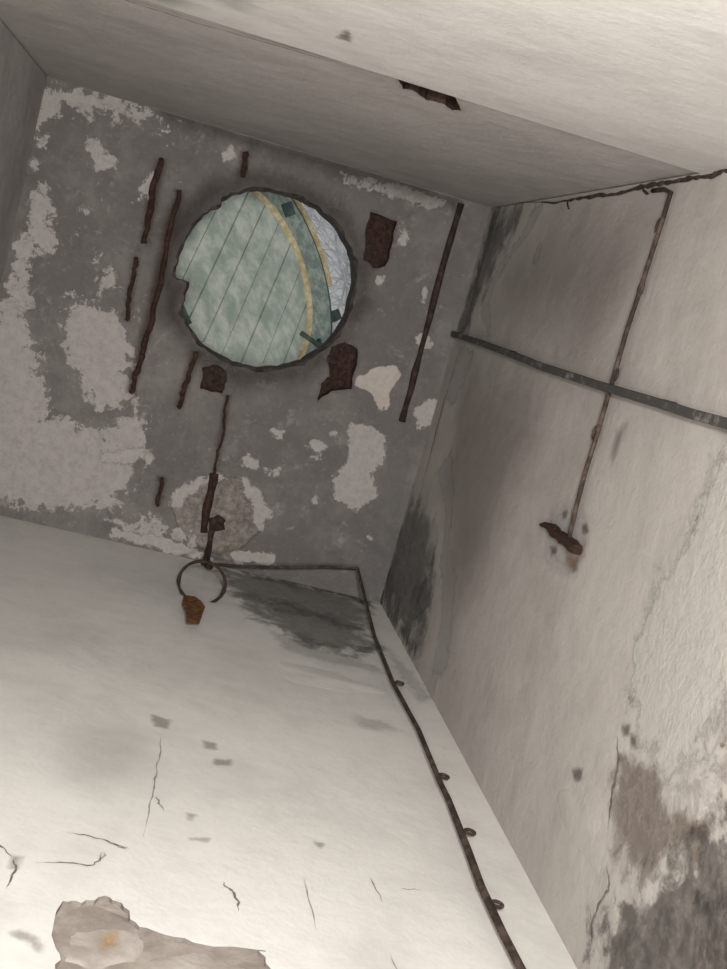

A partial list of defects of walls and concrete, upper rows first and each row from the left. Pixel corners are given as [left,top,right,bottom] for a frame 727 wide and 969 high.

rust [141,158,164,244]
rust [363,213,395,268]
rust [125,257,138,322]
peeling [0,80,286,566]
rust [129,190,182,395]
rust [318,342,356,397]
peeling [355,365,402,411]
peeling [413,398,438,430]
peeling [304,422,386,513]
crack [0,732,164,886]
leakage [590,757,727,969]
flaking render [52,900,266,969]